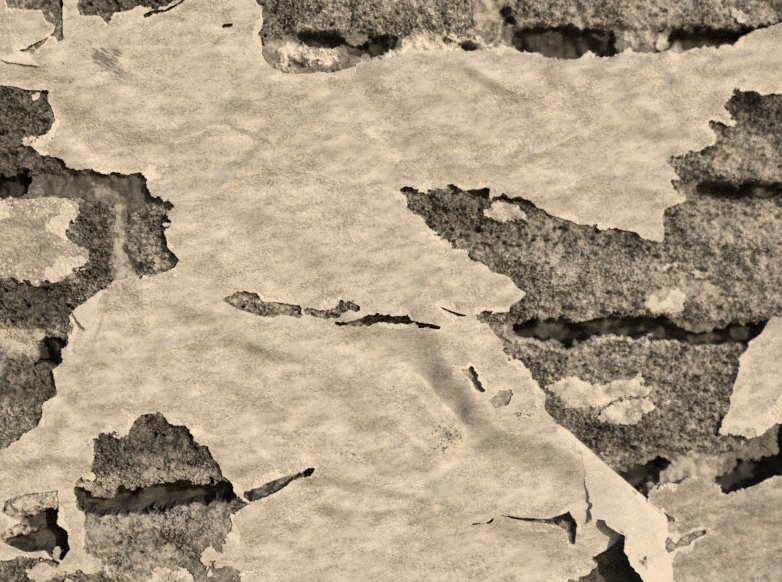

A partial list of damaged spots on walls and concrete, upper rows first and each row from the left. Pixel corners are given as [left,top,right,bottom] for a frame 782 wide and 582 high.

spalling [6,0,63,54]
spalling [77,0,183,24]
spalling [256,0,474,65]
spalling [505,0,782,52]
spalling [0,85,113,176]
spalling [667,88,782,192]
spalling [0,196,116,338]
spalling [126,199,179,279]
spalling [400,184,782,469]
spalling [0,358,57,450]
spalling [0,412,252,582]
spalling [568,556,599,582]